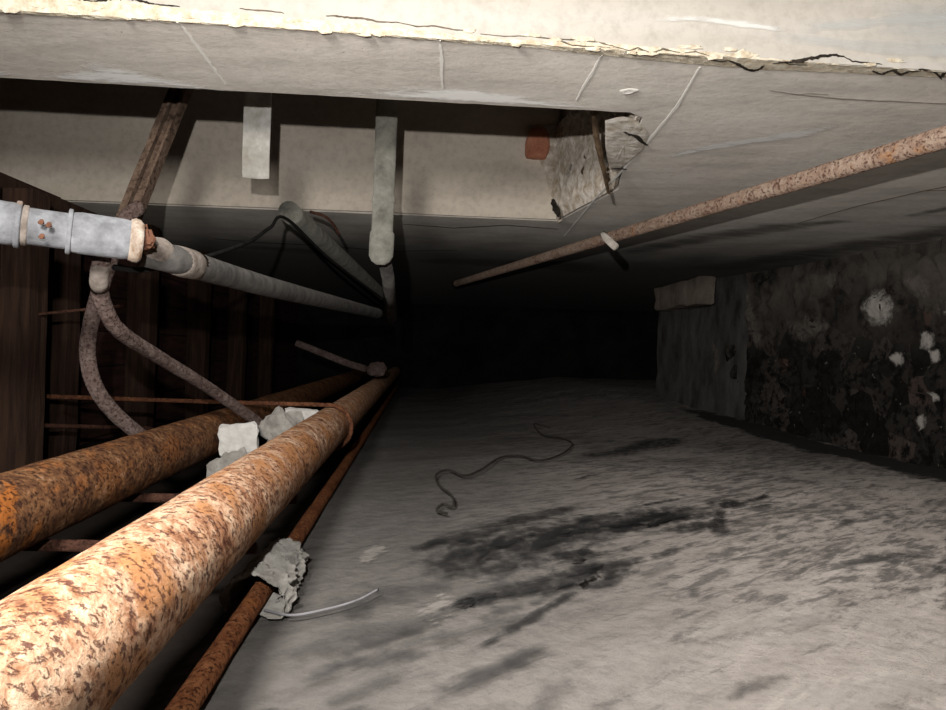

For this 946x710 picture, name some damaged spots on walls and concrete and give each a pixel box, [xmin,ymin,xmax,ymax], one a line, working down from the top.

spalling [0,0,946,77]
spalling [525,109,648,223]
crack [326,15,946,251]
damp [412,495,771,645]